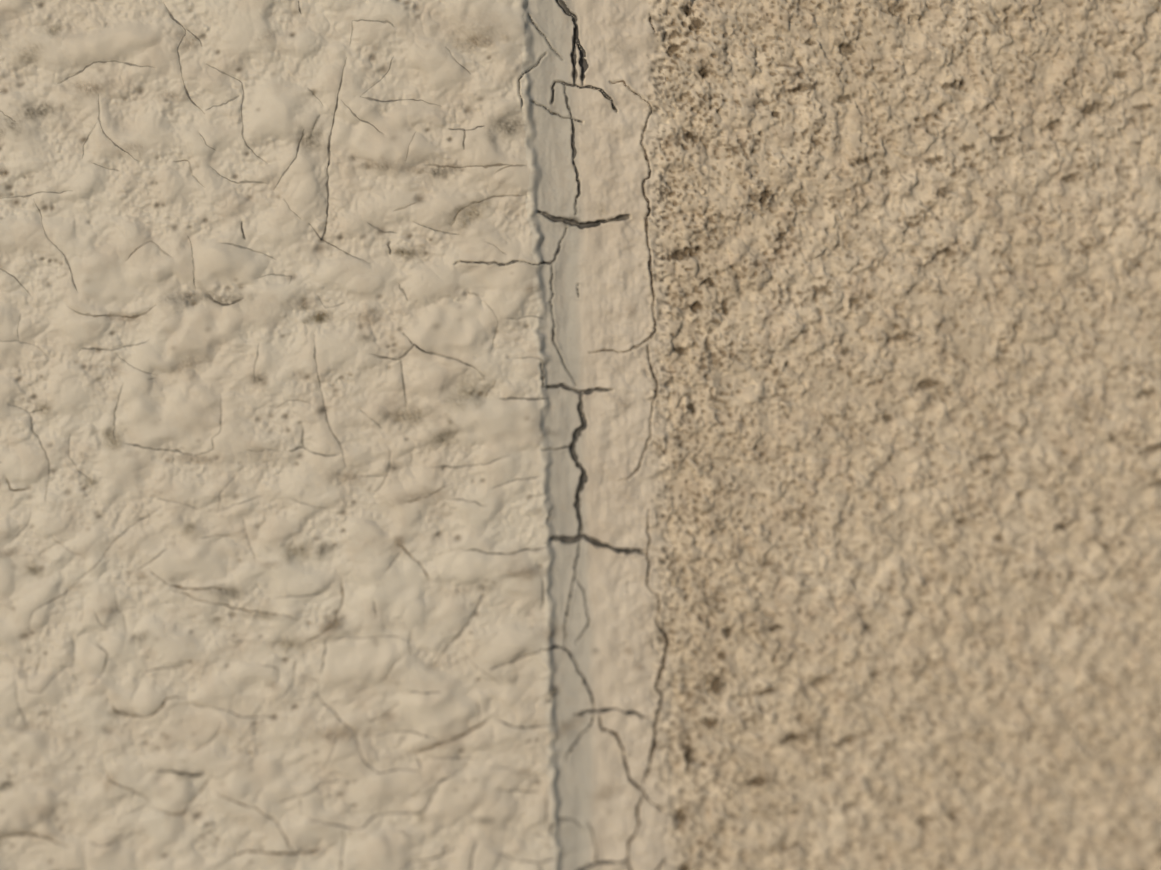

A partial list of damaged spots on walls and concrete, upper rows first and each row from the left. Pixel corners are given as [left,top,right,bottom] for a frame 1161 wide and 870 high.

crack [316,79,419,250]
crack [381,340,428,391]
crack [114,406,181,453]
crack [460,0,669,870]
crack [314,588,344,671]
crack [229,799,302,855]